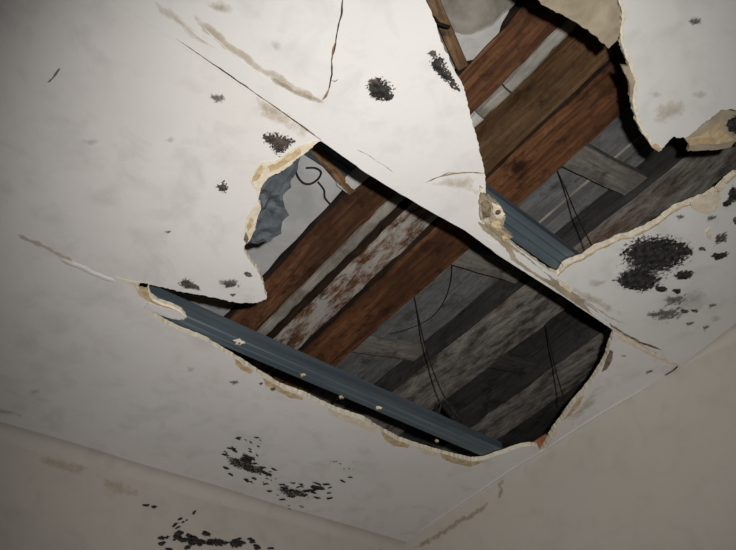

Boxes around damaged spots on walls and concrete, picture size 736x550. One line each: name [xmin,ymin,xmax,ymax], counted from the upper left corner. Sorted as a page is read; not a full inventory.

crack [177,39,320,139]
crack [322,0,343,100]
water stain [365,76,396,101]
water stain [427,50,460,92]
water stain [262,132,296,157]
peeling [686,121,735,146]
peeling [690,180,727,214]
water stain [612,234,729,319]
water stain [222,437,333,510]
water stain [157,510,274,550]